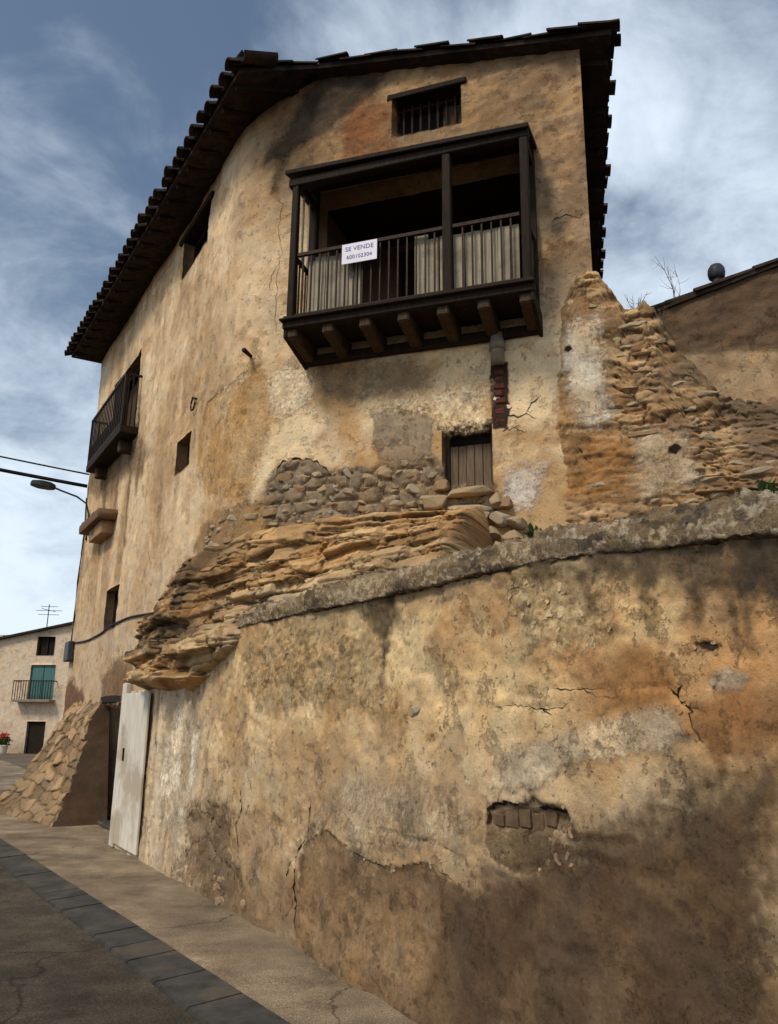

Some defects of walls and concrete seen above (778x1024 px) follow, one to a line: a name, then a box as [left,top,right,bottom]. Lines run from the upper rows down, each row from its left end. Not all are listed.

water stain [264,72,384,189]
crack [503,397,539,432]
water stain [555,412,635,503]
water stain [503,538,778,621]
hole [692,640,718,656]
crack [496,686,624,715]
crack [653,685,704,743]
crack [284,804,315,921]
spalling [483,787,576,872]
water stain [414,760,778,1024]